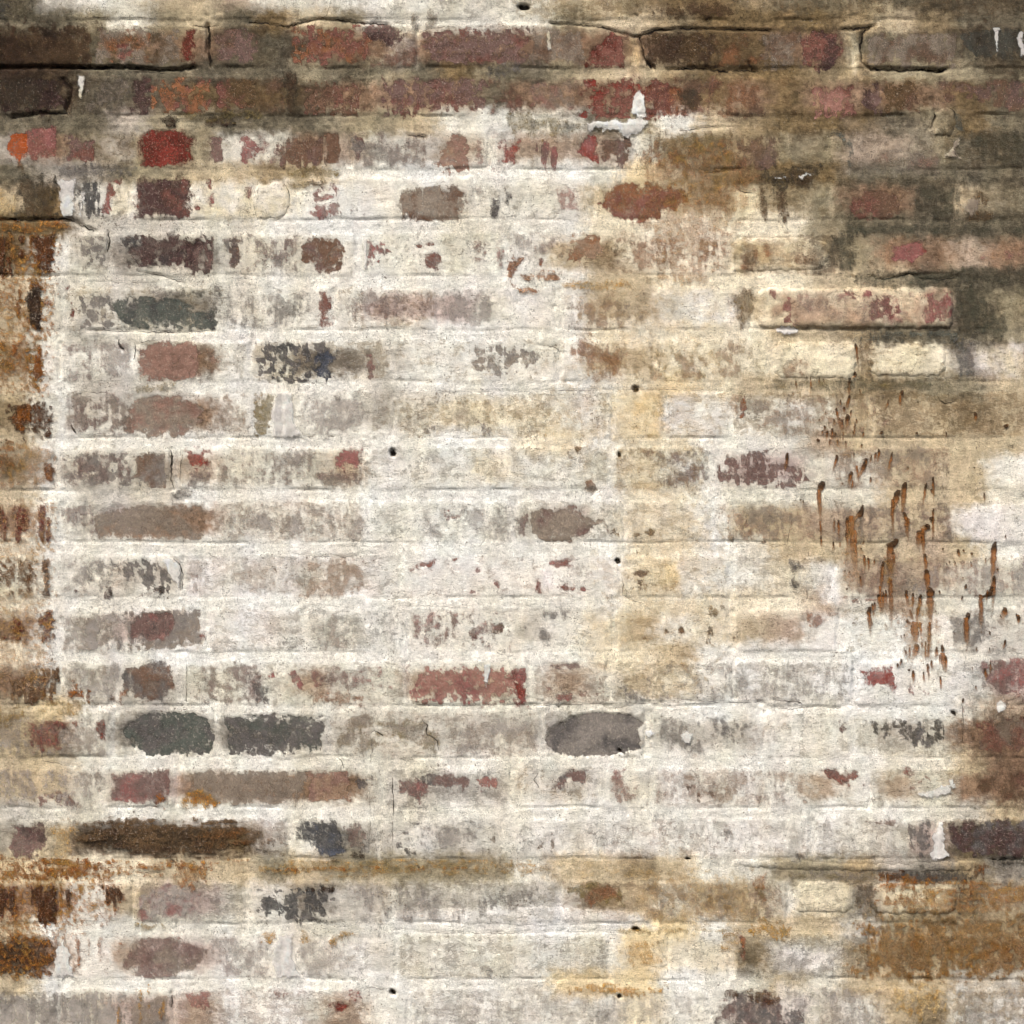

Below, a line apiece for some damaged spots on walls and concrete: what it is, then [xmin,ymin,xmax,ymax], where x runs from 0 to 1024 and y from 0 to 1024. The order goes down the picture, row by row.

crack [3,25,215,119]
peeling [291,22,765,121]
crack [550,17,770,73]
crack [841,25,947,73]
leakage [902,0,1024,76]
leakage [506,88,823,281]
leakage [767,178,1024,393]
corrosion [816,477,947,686]
corrosion [953,535,1021,676]
spalling [62,609,325,757]
spalling [545,712,643,789]
corrosion [0,789,275,981]